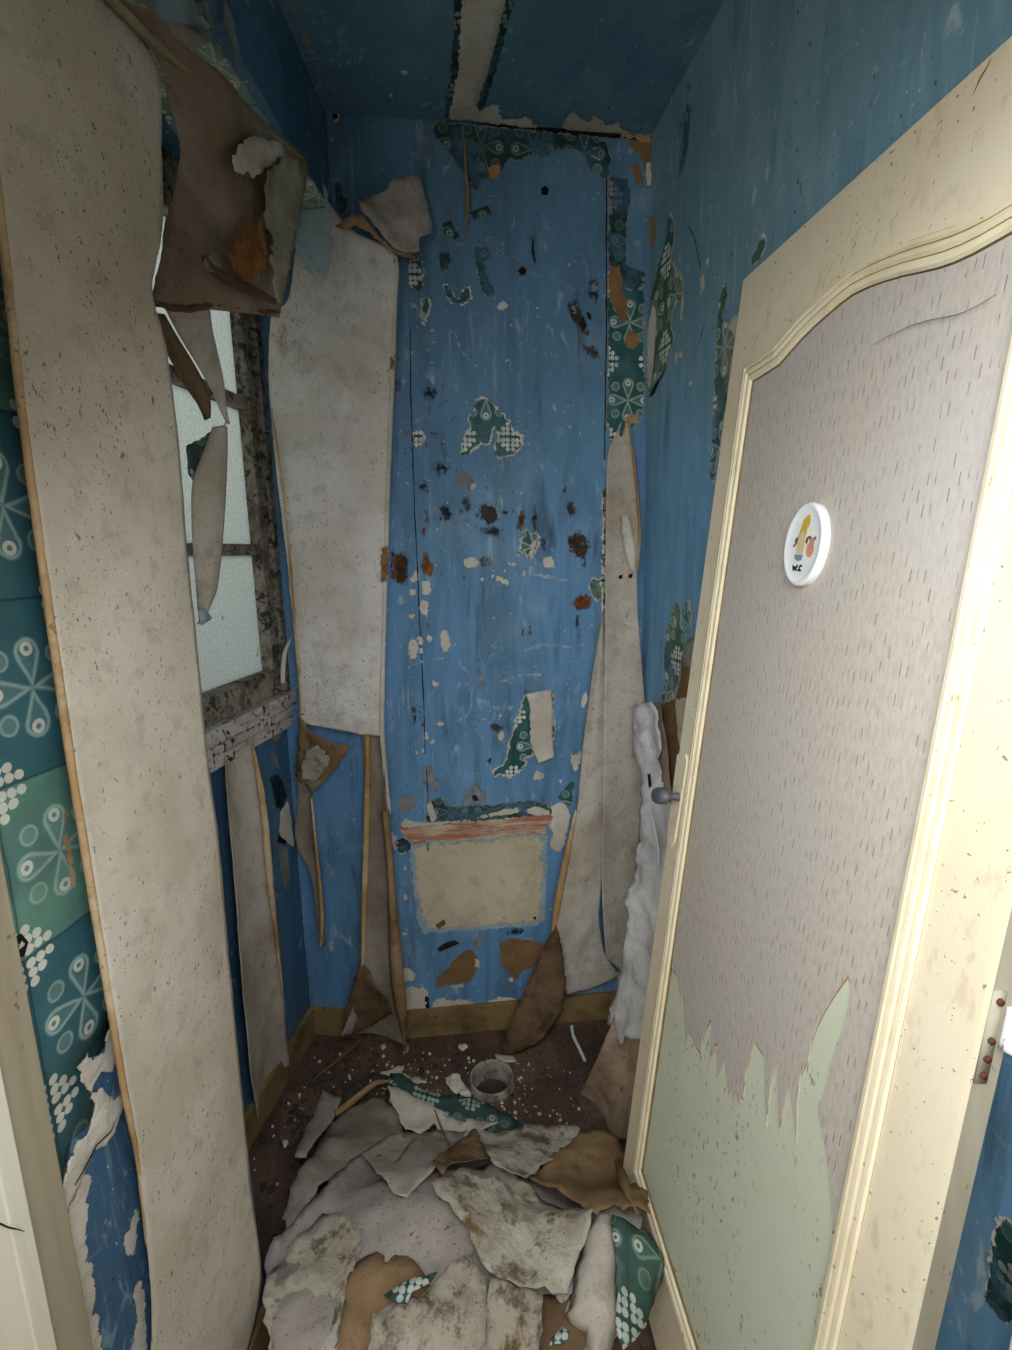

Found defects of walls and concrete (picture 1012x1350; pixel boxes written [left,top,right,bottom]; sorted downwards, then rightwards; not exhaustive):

peeling [431,121,684,440]
peeling [709,281,738,485]
peeling [460,396,524,460]
peeling [464,529,555,586]
peeling [409,570,431,619]
peeling [408,630,451,659]
flaking render [391,695,582,1010]
flaking render [16,934,28,958]
peeling [68,1174,103,1350]
peeling [123,1209,140,1256]
peeling [984,1214,1012,1328]
peeling [130,1280,147,1350]